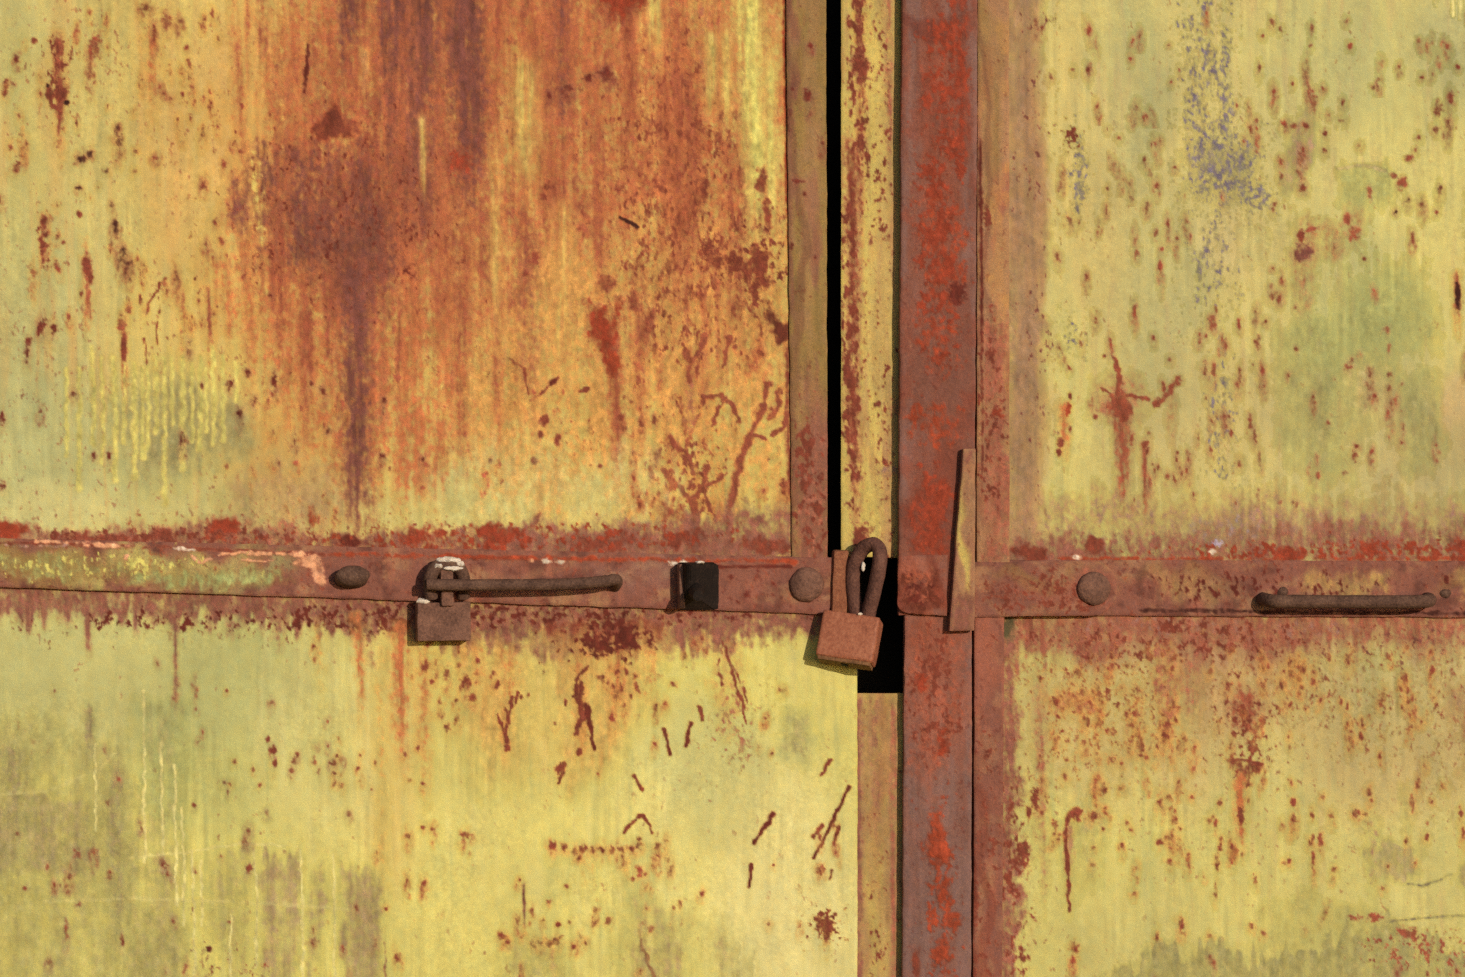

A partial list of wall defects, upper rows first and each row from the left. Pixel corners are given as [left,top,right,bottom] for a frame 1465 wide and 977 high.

corrosion [0,0,828,923]
corrosion [793,0,1465,977]
corrosion [17,834,118,977]
corrosion [159,906,283,977]
corrosion [307,917,356,977]
corrosion [366,933,407,977]
corrosion [491,812,709,977]